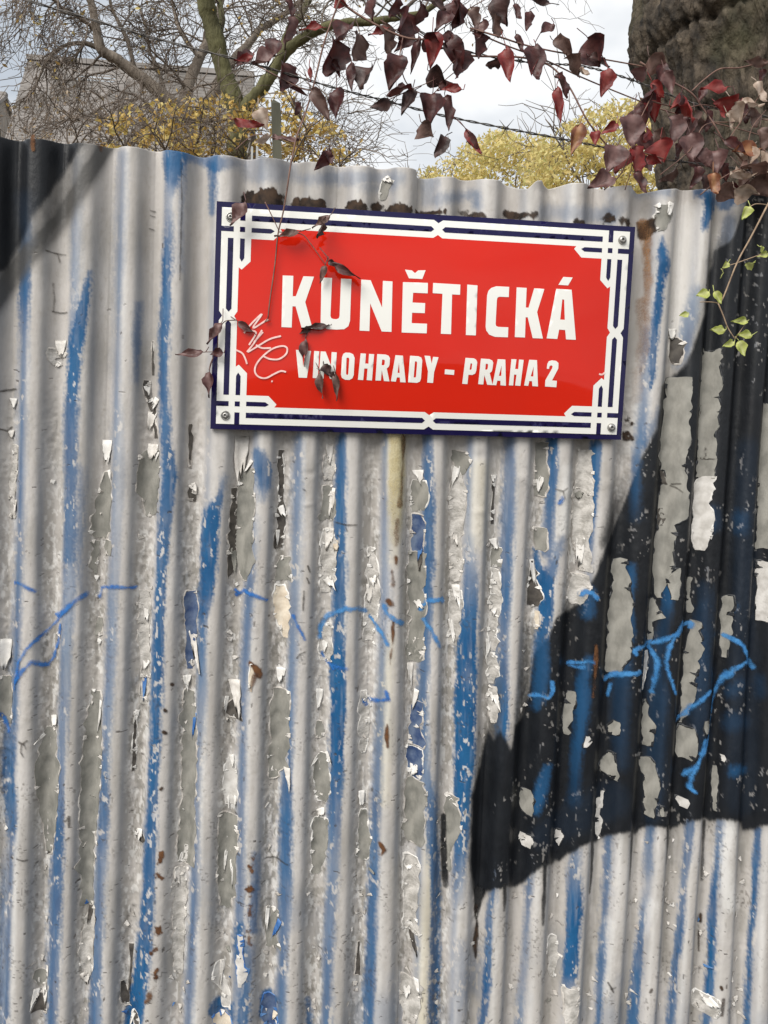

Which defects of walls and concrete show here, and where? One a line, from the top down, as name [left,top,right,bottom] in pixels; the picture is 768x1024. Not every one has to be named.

rust [460,210,486,218]
peeling [88,440,113,581]
peeling [226,436,256,587]
peeling [271,449,293,638]
peeling [566,449,595,605]
peeling [604,328,726,820]
peeling [754,402,768,623]
peeling [74,689,103,985]
peeling [169,590,200,1013]
peeling [216,754,240,908]
peeling [310,751,332,875]
peeling [400,470,463,958]